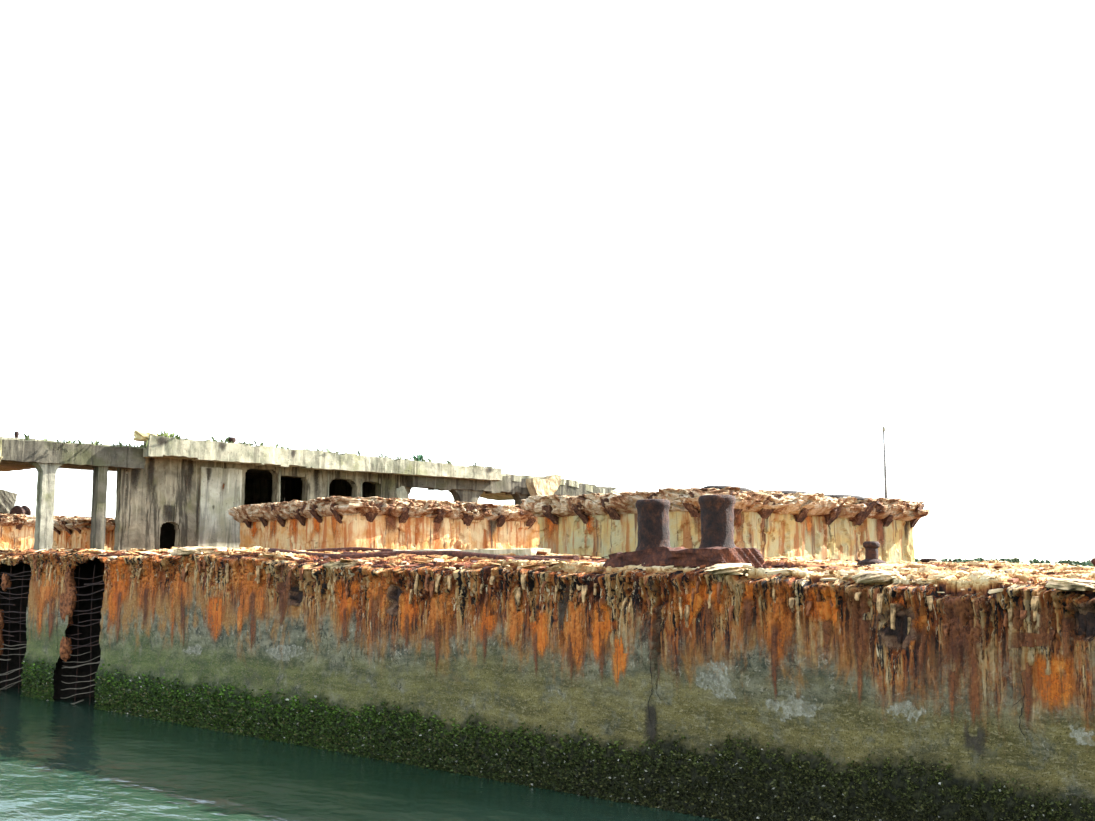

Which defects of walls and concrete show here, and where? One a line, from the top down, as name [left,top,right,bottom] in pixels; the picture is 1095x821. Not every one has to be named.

spalling [0,558,56,692]
spalling [53,559,105,705]
rust [231,516,579,670]
rust [563,601,627,683]
damp [645,706,656,742]
damp [696,662,736,698]
damp [766,692,820,722]
rust [808,588,872,700]
spalling [854,587,921,650]
peeling [1003,596,1039,627]
rust [1009,608,1074,720]
damp [1070,728,1094,746]